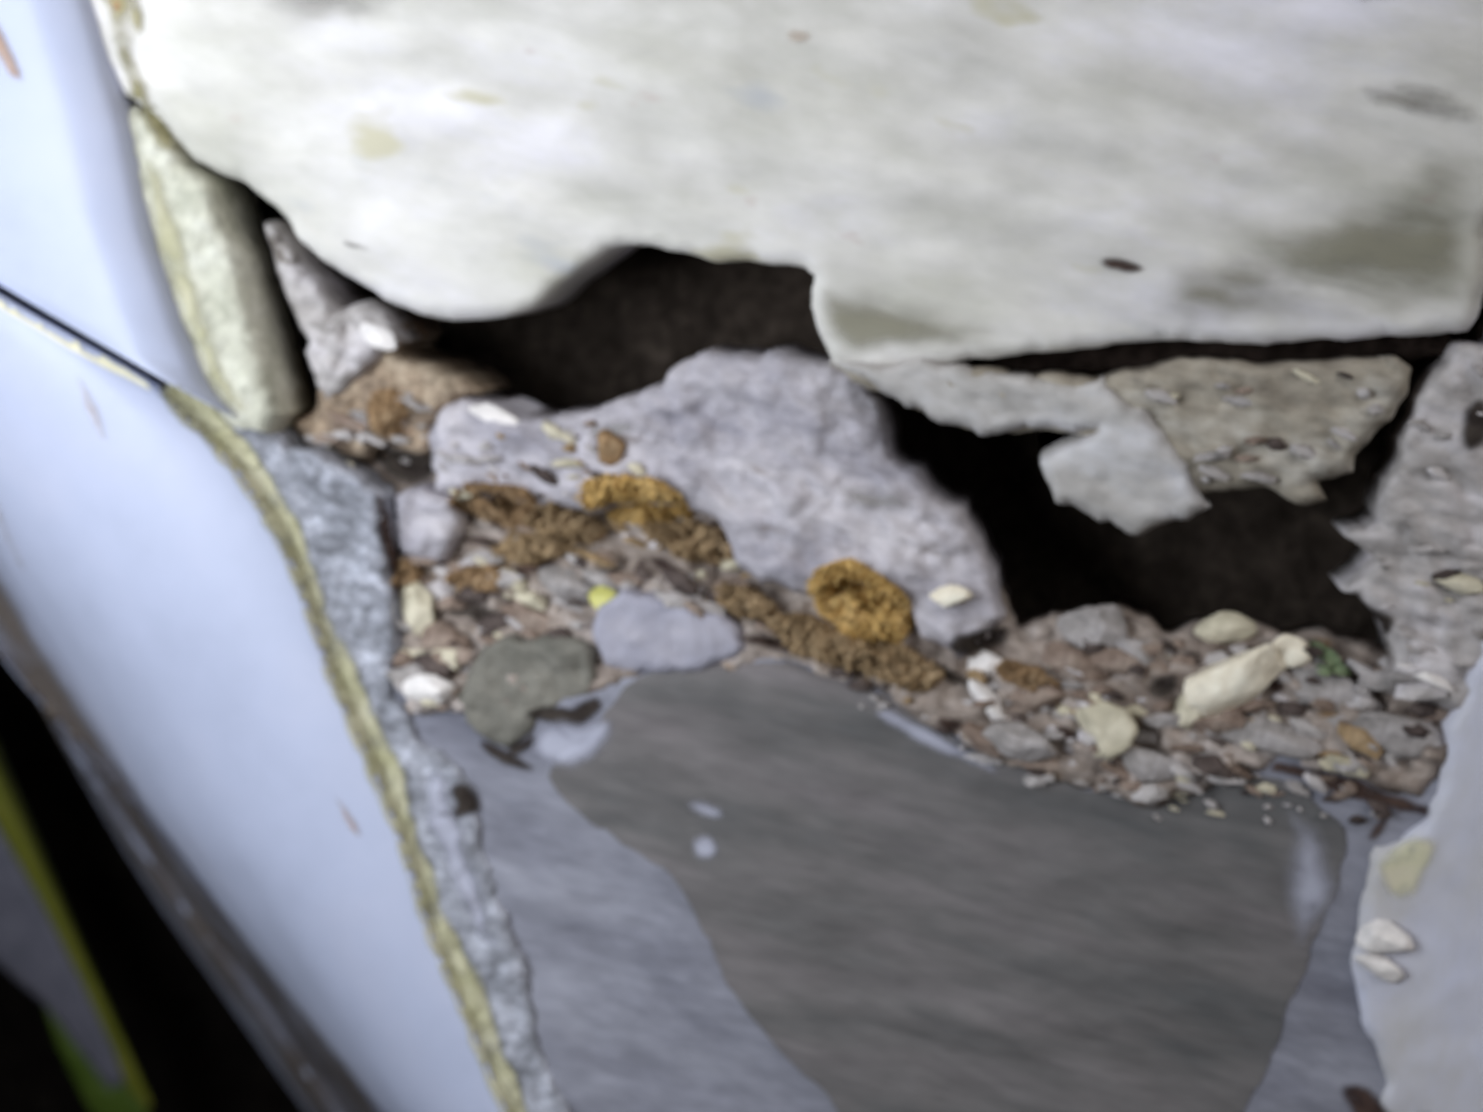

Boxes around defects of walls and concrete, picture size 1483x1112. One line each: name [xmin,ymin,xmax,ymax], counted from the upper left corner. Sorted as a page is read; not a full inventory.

spalling [255,191,289,227]
crack [0,285,168,386]
flaking render [289,245,1483,711]
spalling [441,784,479,817]